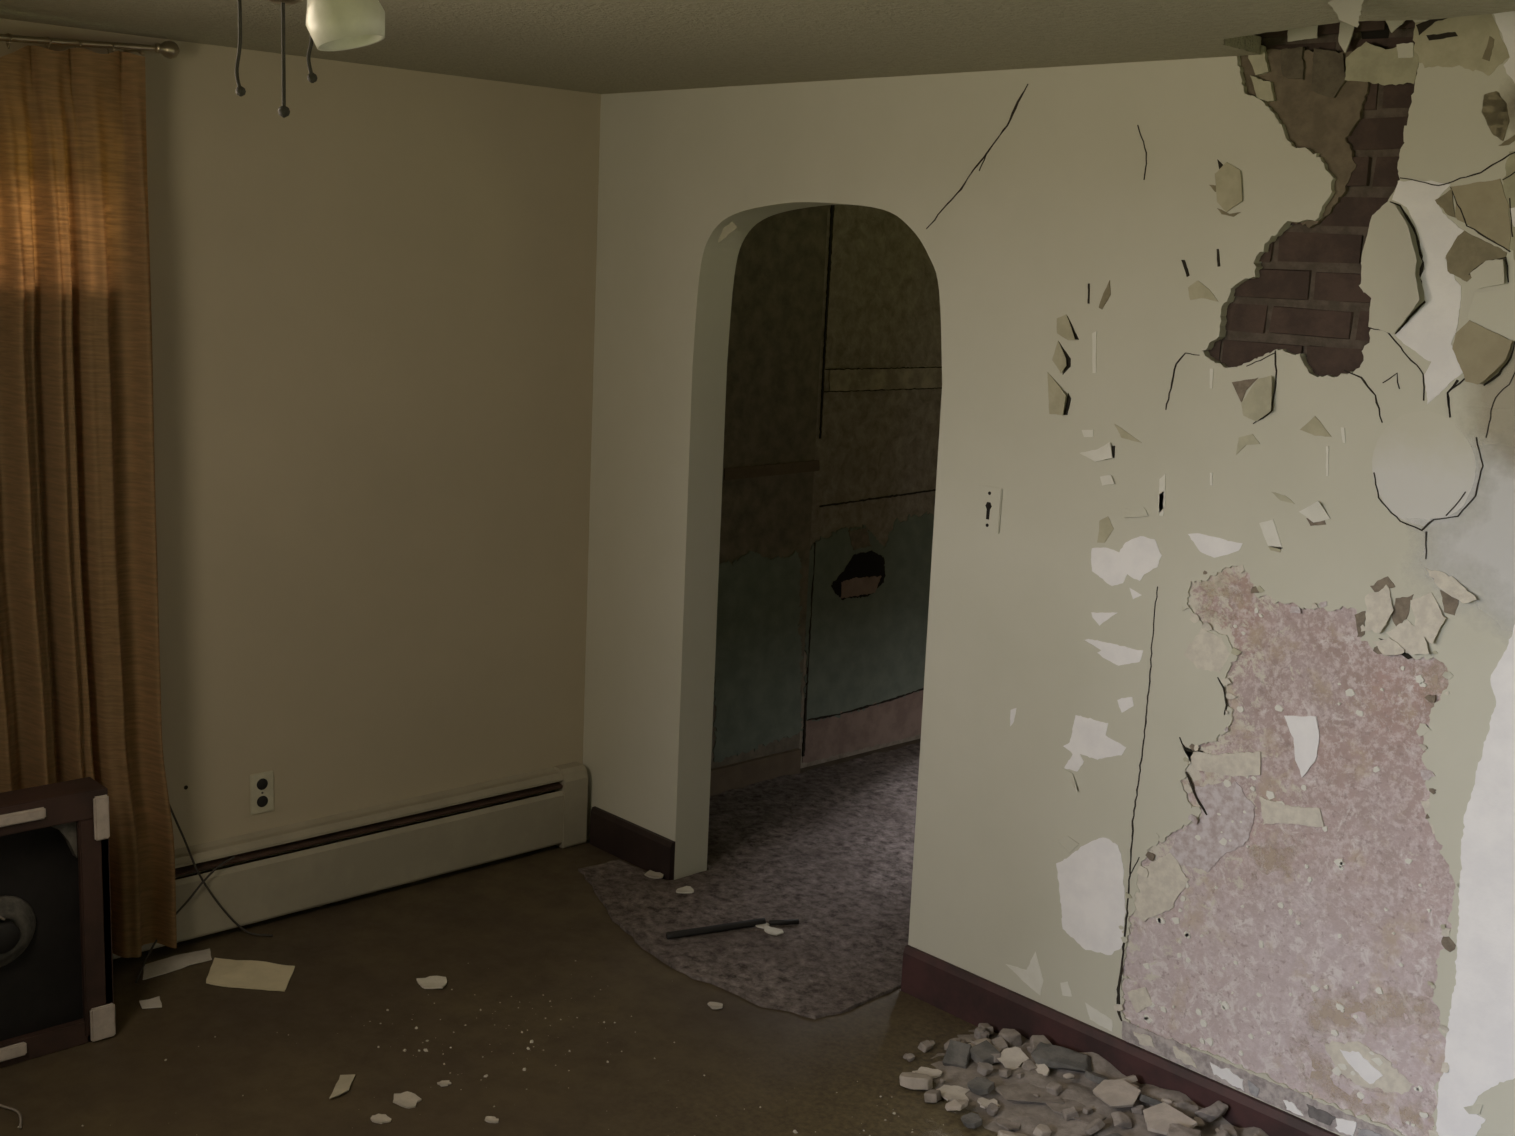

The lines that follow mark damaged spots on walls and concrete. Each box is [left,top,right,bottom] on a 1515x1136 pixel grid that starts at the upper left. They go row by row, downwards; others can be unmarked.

crack [926,84,1028,229]
peeling [1047,315,1097,415]
peeling [1087,280,1111,309]
crack [1137,125,1147,180]
flaking render [1181,0,1515,455]
peeling [1080,424,1142,486]
peeling [1300,416,1346,476]
peeling [713,511,934,763]
crack [1116,586,1207,1021]
flaking render [1006,451,1515,1136]